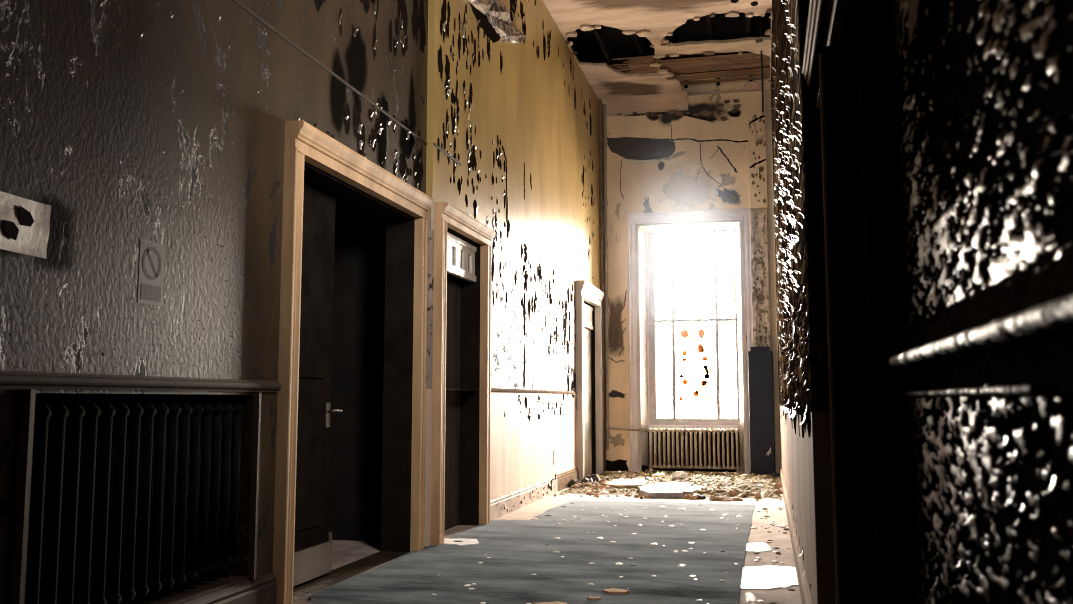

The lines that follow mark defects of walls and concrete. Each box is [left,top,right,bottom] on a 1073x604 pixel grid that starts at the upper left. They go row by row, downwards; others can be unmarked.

peeling [314,89,423,191]
crack [665,120,748,183]
flaking render [360,0,601,421]